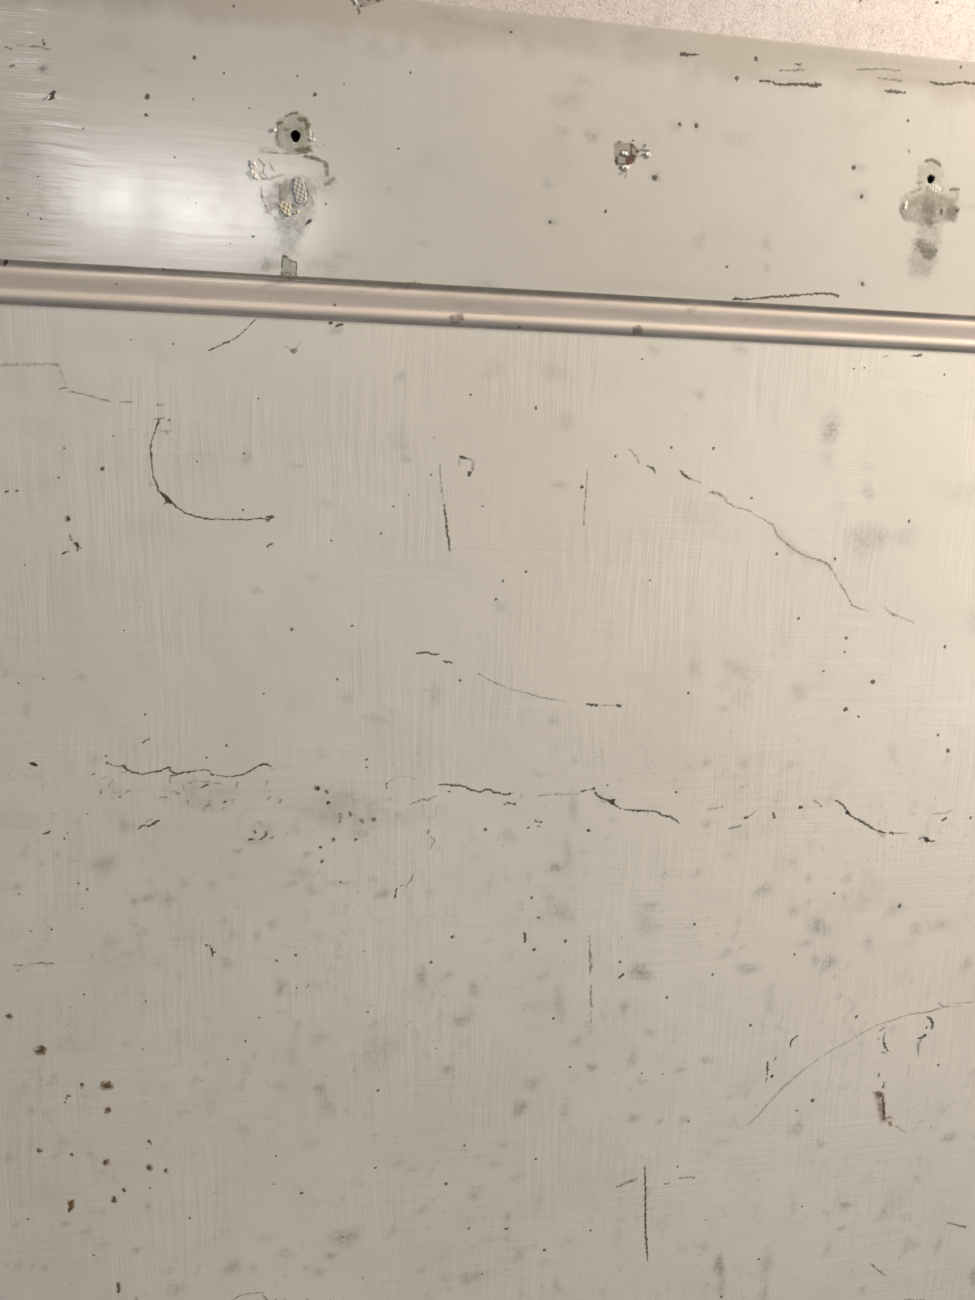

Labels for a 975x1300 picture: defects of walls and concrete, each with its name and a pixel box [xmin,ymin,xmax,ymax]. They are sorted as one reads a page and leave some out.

peeling [250,111,334,225]
peeling [615,140,651,173]
peeling [901,159,960,224]
peeling [277,255,307,282]
crack [105,755,270,777]
crack [581,787,679,823]
crack [723,800,947,842]